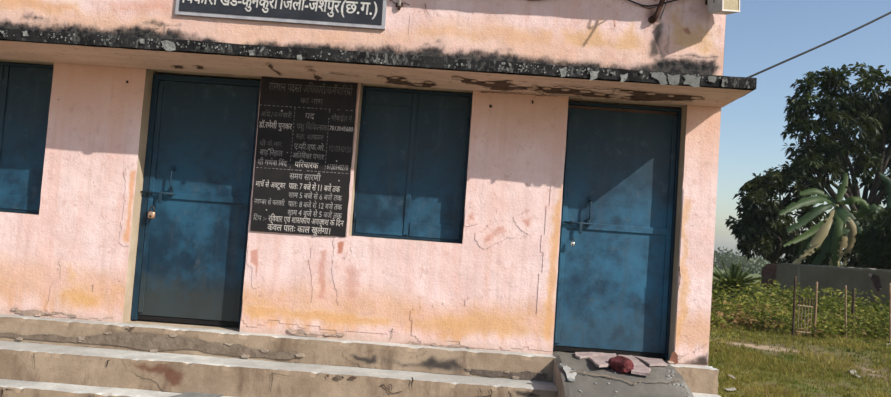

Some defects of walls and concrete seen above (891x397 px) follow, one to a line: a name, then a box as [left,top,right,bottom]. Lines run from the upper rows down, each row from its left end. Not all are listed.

damp [0,0,726,76]
spalling [448,62,728,103]
damp [45,255,117,320]
damp [242,244,398,334]
damp [343,177,563,376]